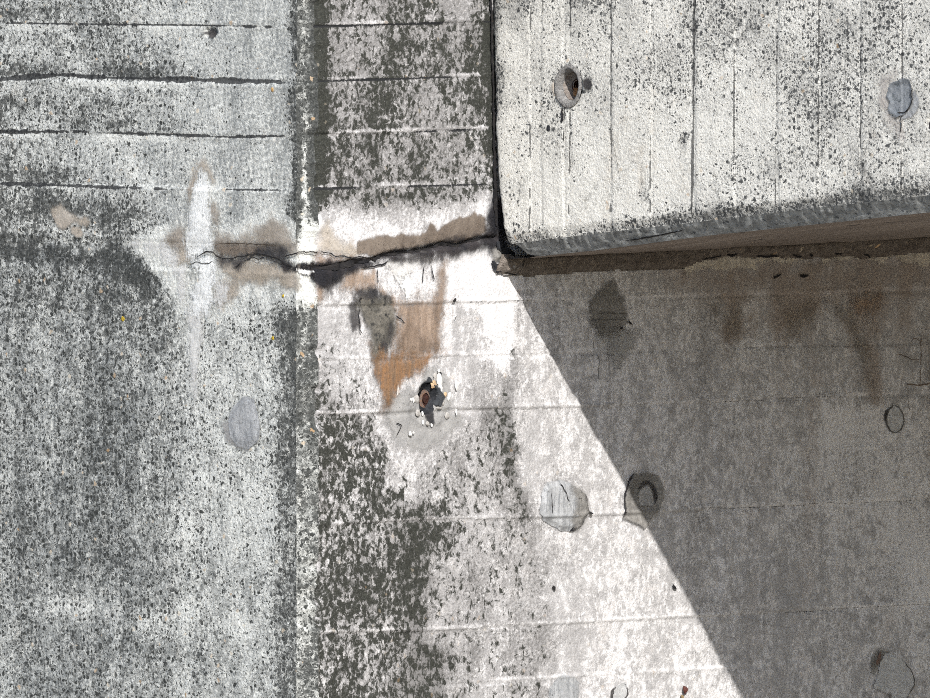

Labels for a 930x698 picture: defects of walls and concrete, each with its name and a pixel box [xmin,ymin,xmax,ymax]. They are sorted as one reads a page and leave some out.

damp [132,160,507,398]
crack [191,237,491,283]
corrosion [341,262,446,410]